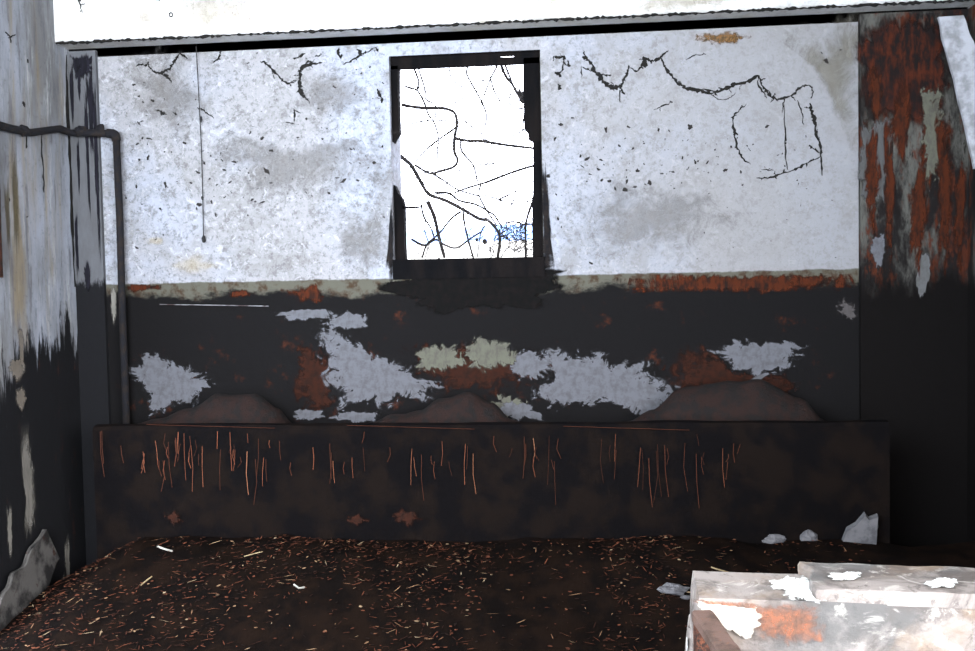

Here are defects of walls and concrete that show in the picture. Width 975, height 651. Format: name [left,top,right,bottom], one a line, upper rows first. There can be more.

crack [136,52,188,83]
crack [261,47,379,124]
crack [553,51,823,179]
peeling [129,352,215,417]
peeling [274,309,680,423]
peeling [710,338,804,380]
peeling [698,599,762,639]
corrosion [701,600,822,641]